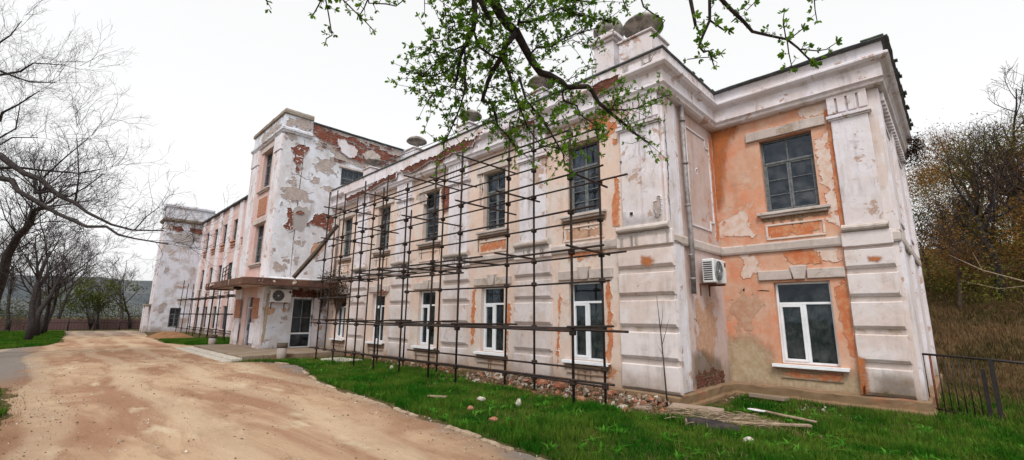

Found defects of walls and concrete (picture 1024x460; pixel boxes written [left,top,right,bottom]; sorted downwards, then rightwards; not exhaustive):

flaking render [261,116,536,283]
flaking render [566,160,634,240]
flaking render [707,101,844,242]
flaking render [783,247,843,265]
flaking render [605,282,614,377]
flaking render [695,254,766,389]
flaking render [834,277,856,358]